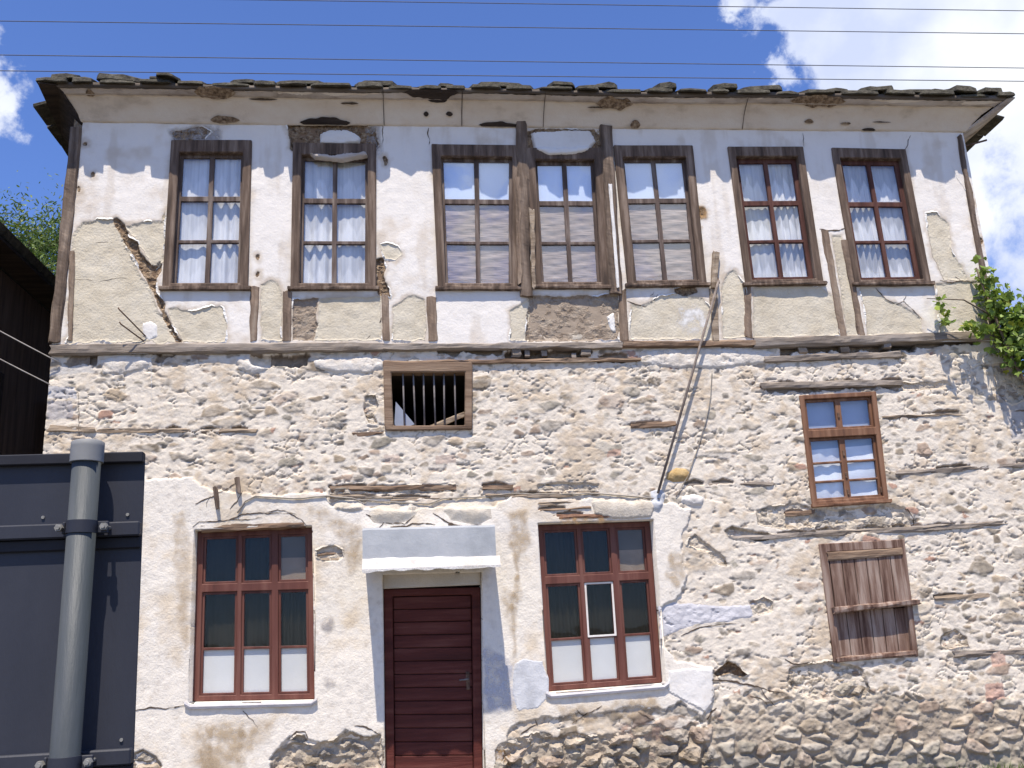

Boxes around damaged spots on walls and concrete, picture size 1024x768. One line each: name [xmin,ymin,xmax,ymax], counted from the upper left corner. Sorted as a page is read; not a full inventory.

peeling [64,211,228,345]
peeling [256,241,427,343]
peeling [508,235,922,343]
peeling [924,210,989,332]
crack [193,484,307,527]
spalling [314,544,345,562]
spalling [274,732,386,768]
spalling [492,724,717,768]